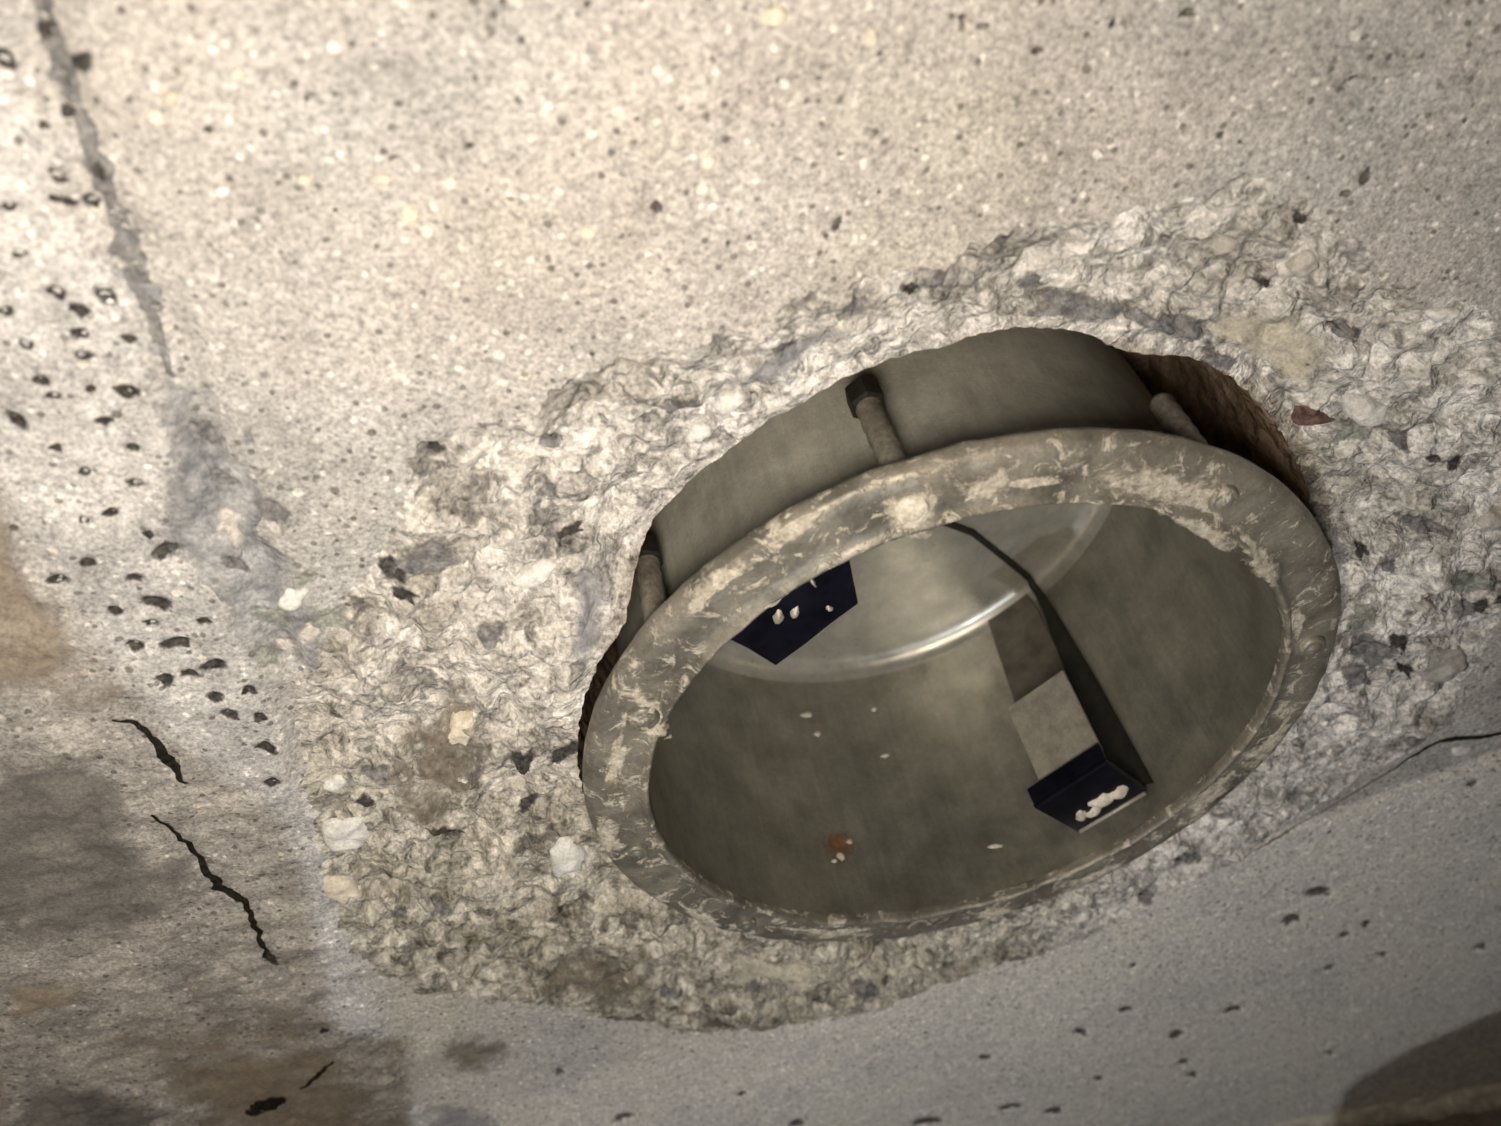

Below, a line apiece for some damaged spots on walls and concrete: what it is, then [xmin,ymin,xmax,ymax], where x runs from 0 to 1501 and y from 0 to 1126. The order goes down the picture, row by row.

spalling [761,5,788,27]
spalling [865,27,878,48]
spalling [779,77,791,90]
spalling [701,153,717,170]
spalling [1339,167,1370,197]
spalling [107,606,123,616]
spalling [126,574,190,652]
spalling [142,173,1501,1034]
crack [112,720,187,784]
crack [1240,732,1501,862]
crack [151,815,278,965]